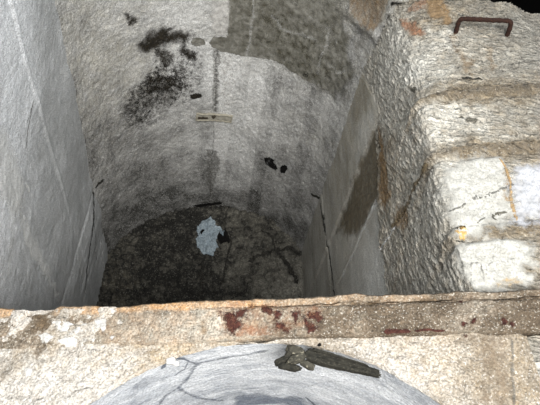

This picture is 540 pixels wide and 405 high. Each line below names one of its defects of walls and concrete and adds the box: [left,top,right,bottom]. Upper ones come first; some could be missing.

leakage [125,0,354,126]
leakage [340,130,381,234]
crack [85,179,104,290]
peeling [195,217,230,256]
crack [311,193,335,296]
rust [218,306,255,336]
rust [261,304,323,334]